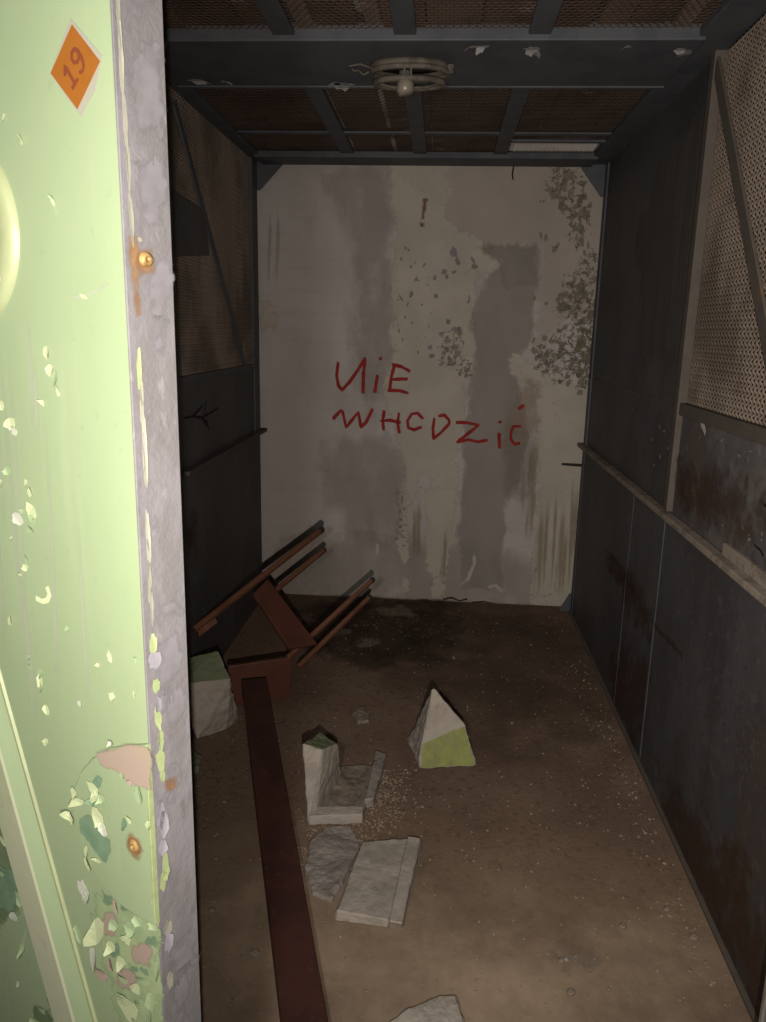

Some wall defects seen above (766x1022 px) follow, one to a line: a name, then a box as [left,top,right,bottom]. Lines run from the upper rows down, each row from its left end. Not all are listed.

peeling [116,0,168,247]
corrosion [130,241,152,314]
peeling [145,260,174,324]
peeling [43,346,60,396]
leakage [428,167,598,593]
peeling [0,400,17,436]
peeling [12,479,36,533]
peeling [36,586,52,604]
peeling [60,510,199,1022]
corrosion [127,835,141,857]